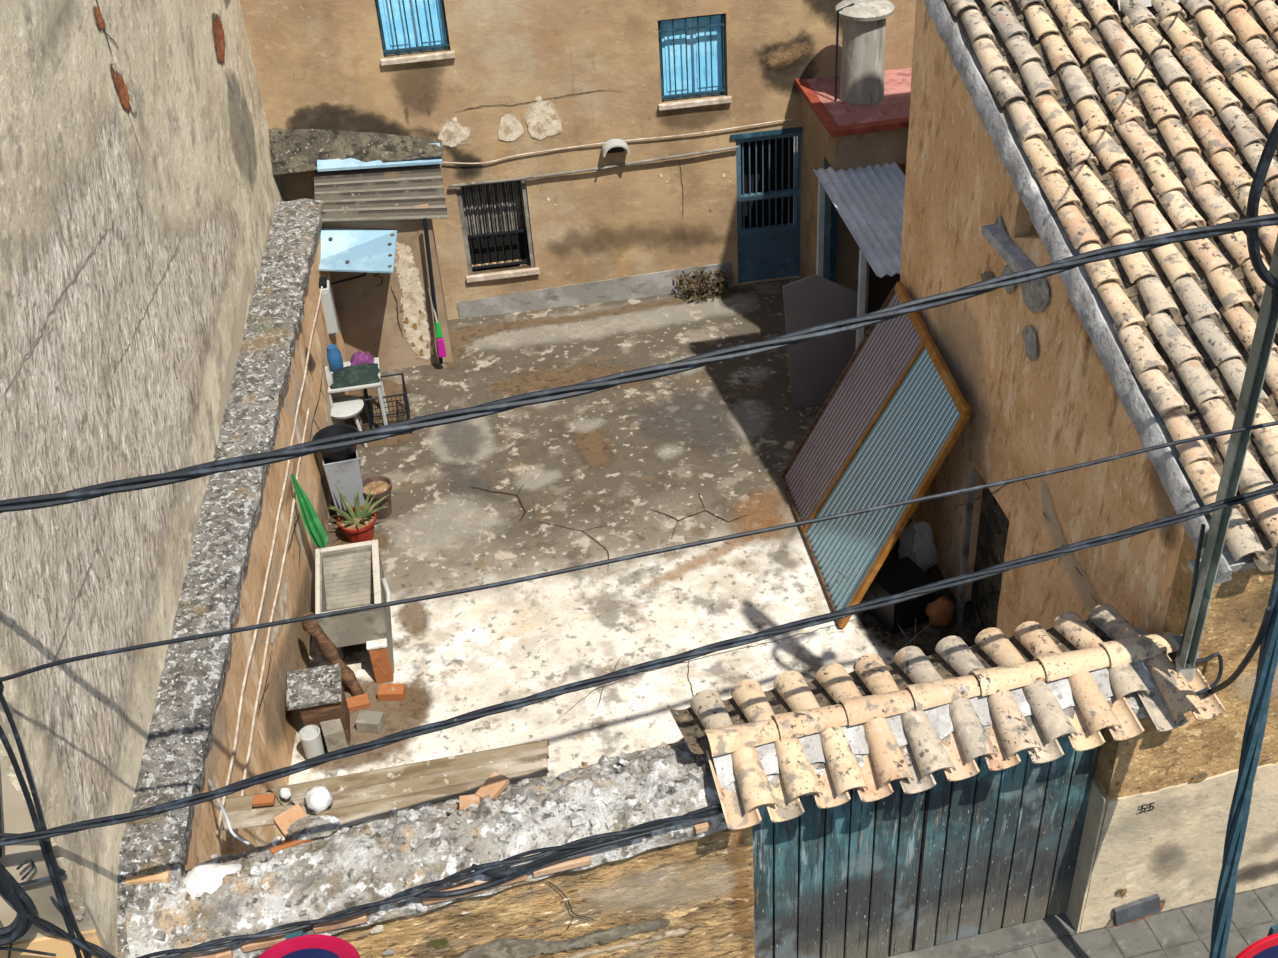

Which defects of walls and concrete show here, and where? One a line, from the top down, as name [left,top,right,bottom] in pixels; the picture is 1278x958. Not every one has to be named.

flaking render [212,13,225,64]
flaking render [438,117,471,147]
flaking render [498,95,563,141]
crack [469,486,609,566]
crack [651,493,755,538]
flaking render [458,917,686,958]